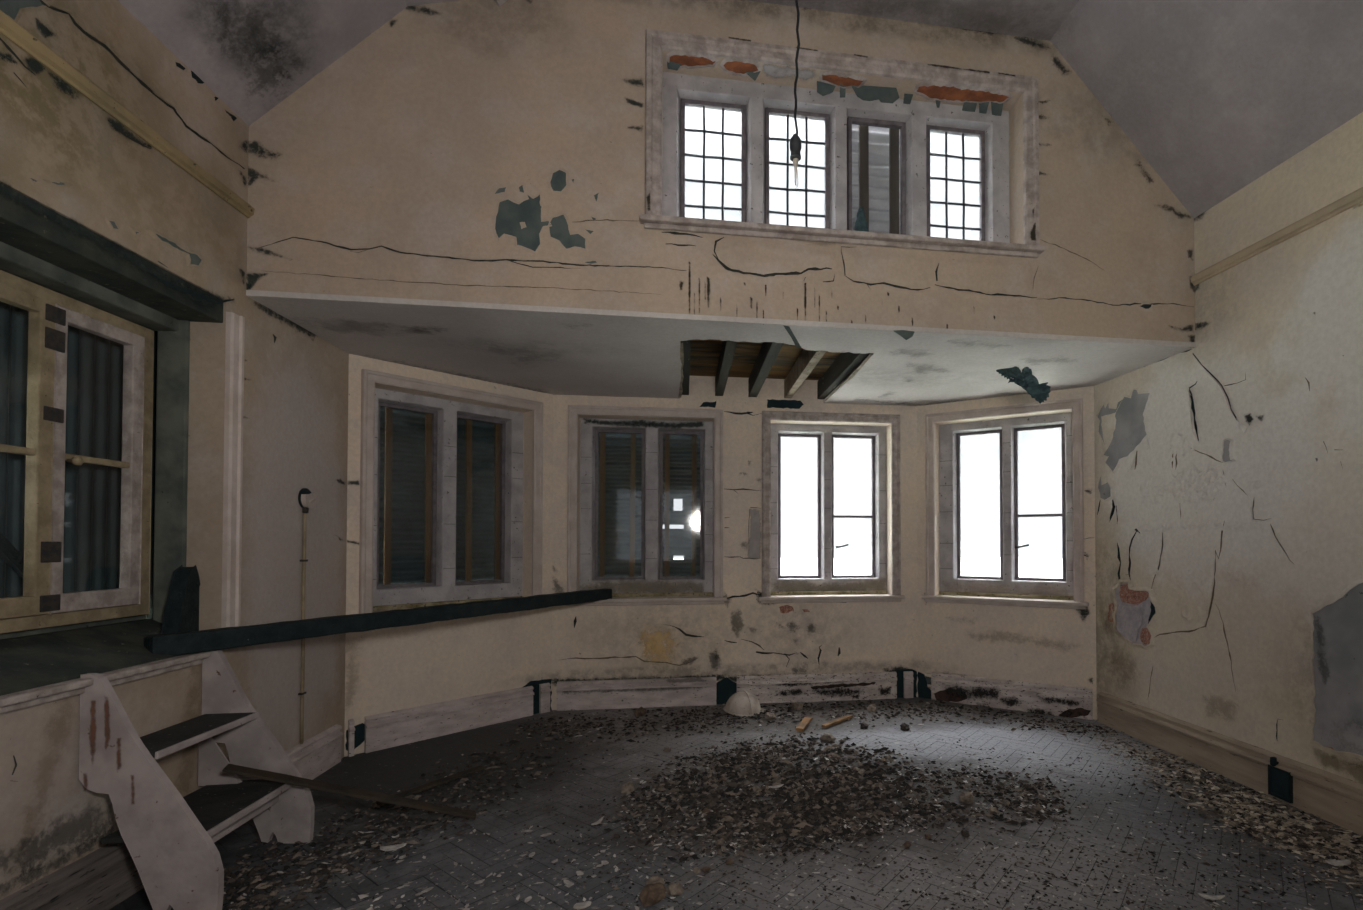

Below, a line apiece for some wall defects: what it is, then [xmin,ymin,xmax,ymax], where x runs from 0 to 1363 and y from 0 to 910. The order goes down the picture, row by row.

crack [0,38,36,87]
leakage [0,52,78,97]
leakage [36,18,53,38]
crack [40,0,248,169]
peeling [817,64,1015,116]
leakage [108,118,152,148]
peeling [492,167,597,264]
crack [255,229,1192,307]
peeling [1094,387,1153,502]
crack [1148,349,1294,697]
flaking render [1108,579,1161,650]
flaking render [1308,578,1363,762]